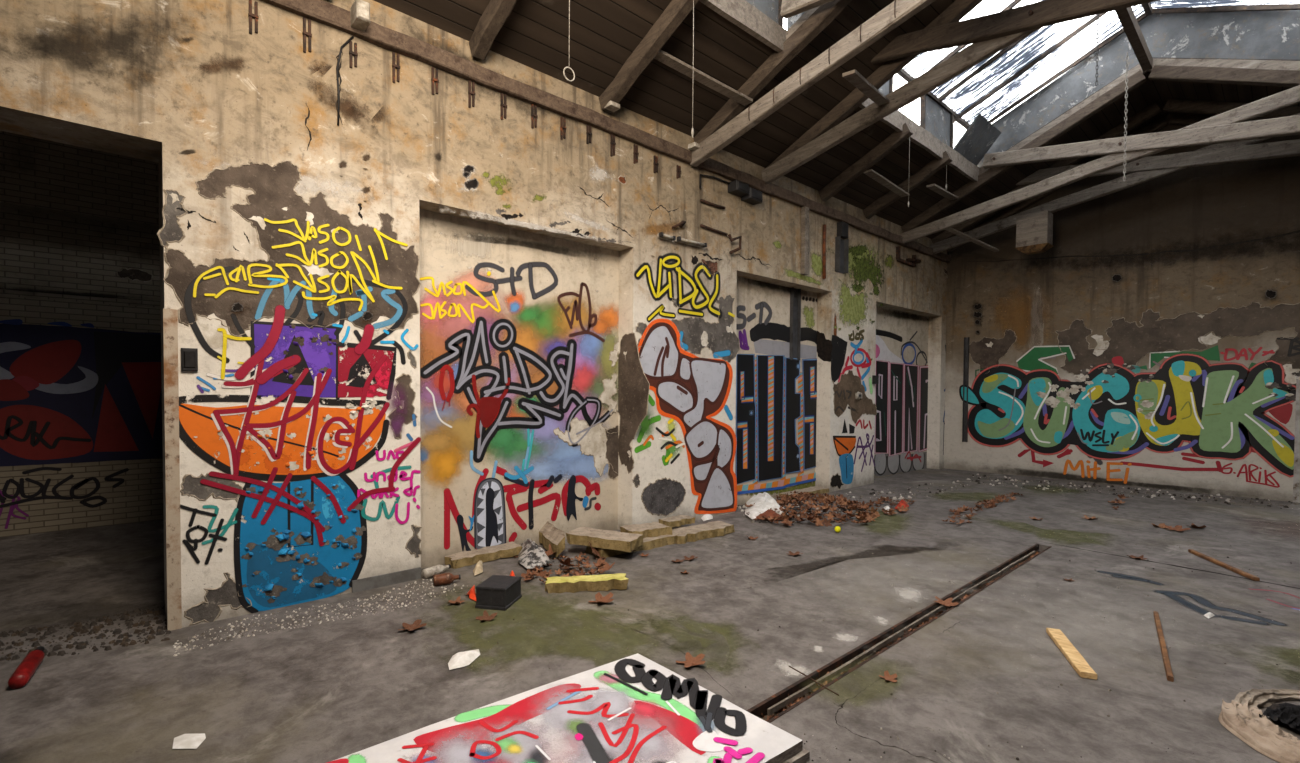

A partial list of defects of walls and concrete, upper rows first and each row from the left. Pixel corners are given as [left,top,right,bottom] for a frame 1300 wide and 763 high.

water stain [27,25,144,80]
spalling [116,160,421,381]
spalling [1037,289,1300,409]
spalling [180,473,270,502]
peeling [239,412,296,465]
peeling [285,451,316,471]
spalling [306,349,418,461]
peeling [1136,400,1155,420]
peeling [184,484,366,625]
crack [834,664,951,763]